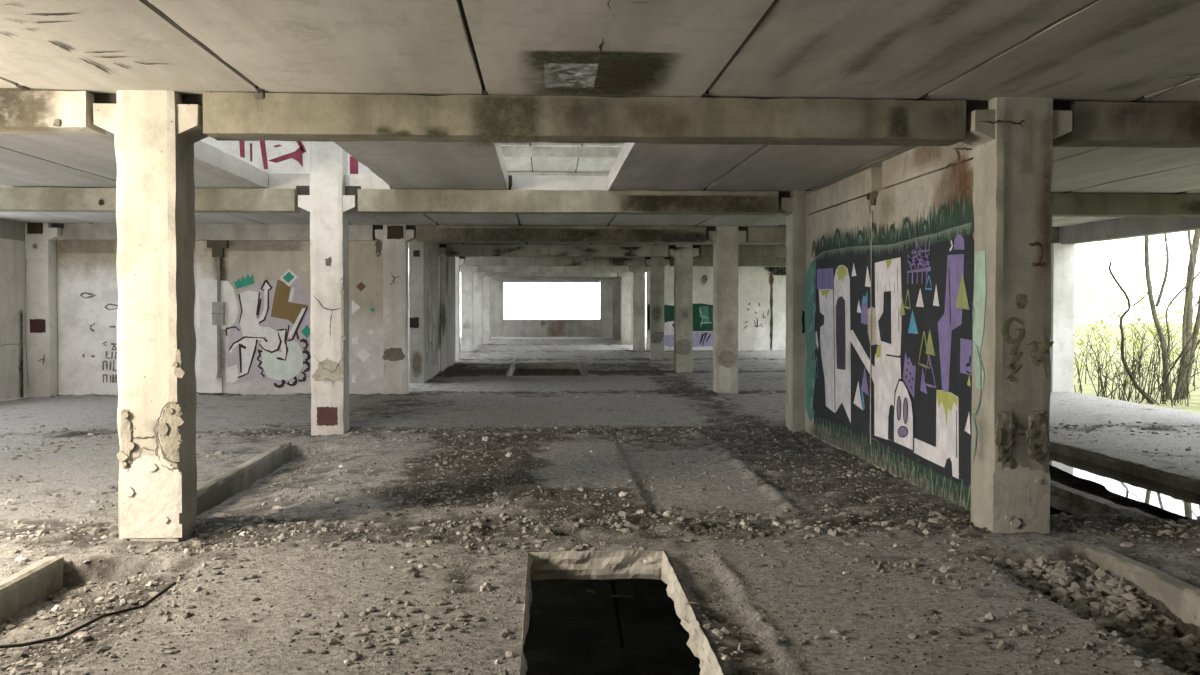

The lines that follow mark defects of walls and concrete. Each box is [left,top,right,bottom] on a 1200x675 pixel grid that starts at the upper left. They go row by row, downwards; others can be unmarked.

water stain [0,88,49,132]
water stain [478,51,670,144]
crack [944,147,972,168]
crack [981,119,1025,127]
crack [314,296,341,337]
spalling [312,277,346,383]
flaking render [116,399,185,538]
flaking render [993,410,1050,534]